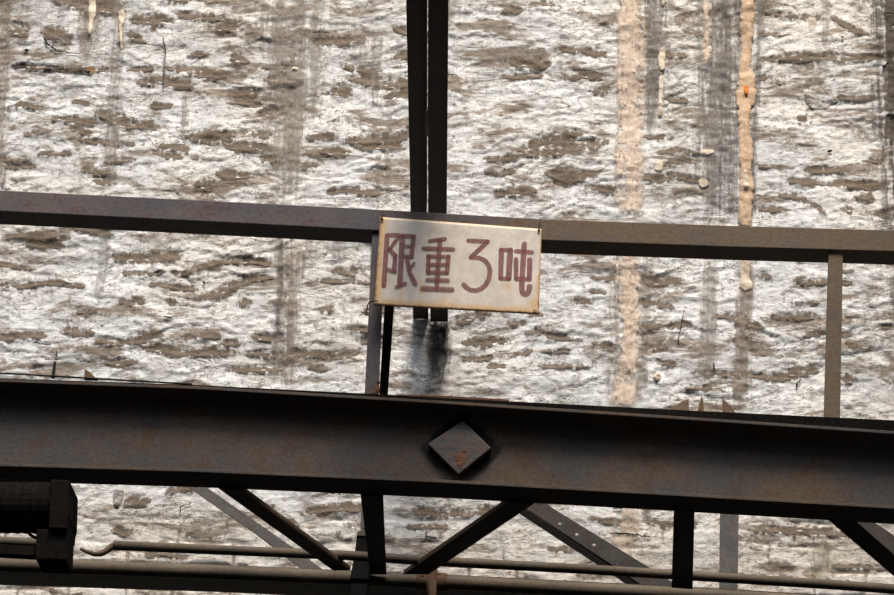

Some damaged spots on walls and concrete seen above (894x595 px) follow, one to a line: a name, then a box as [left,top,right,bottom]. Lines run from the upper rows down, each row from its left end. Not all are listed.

water stain [615,0,671,213]
water stain [864,0,894,230]
water stain [439,323,450,366]
water stain [607,256,648,406]